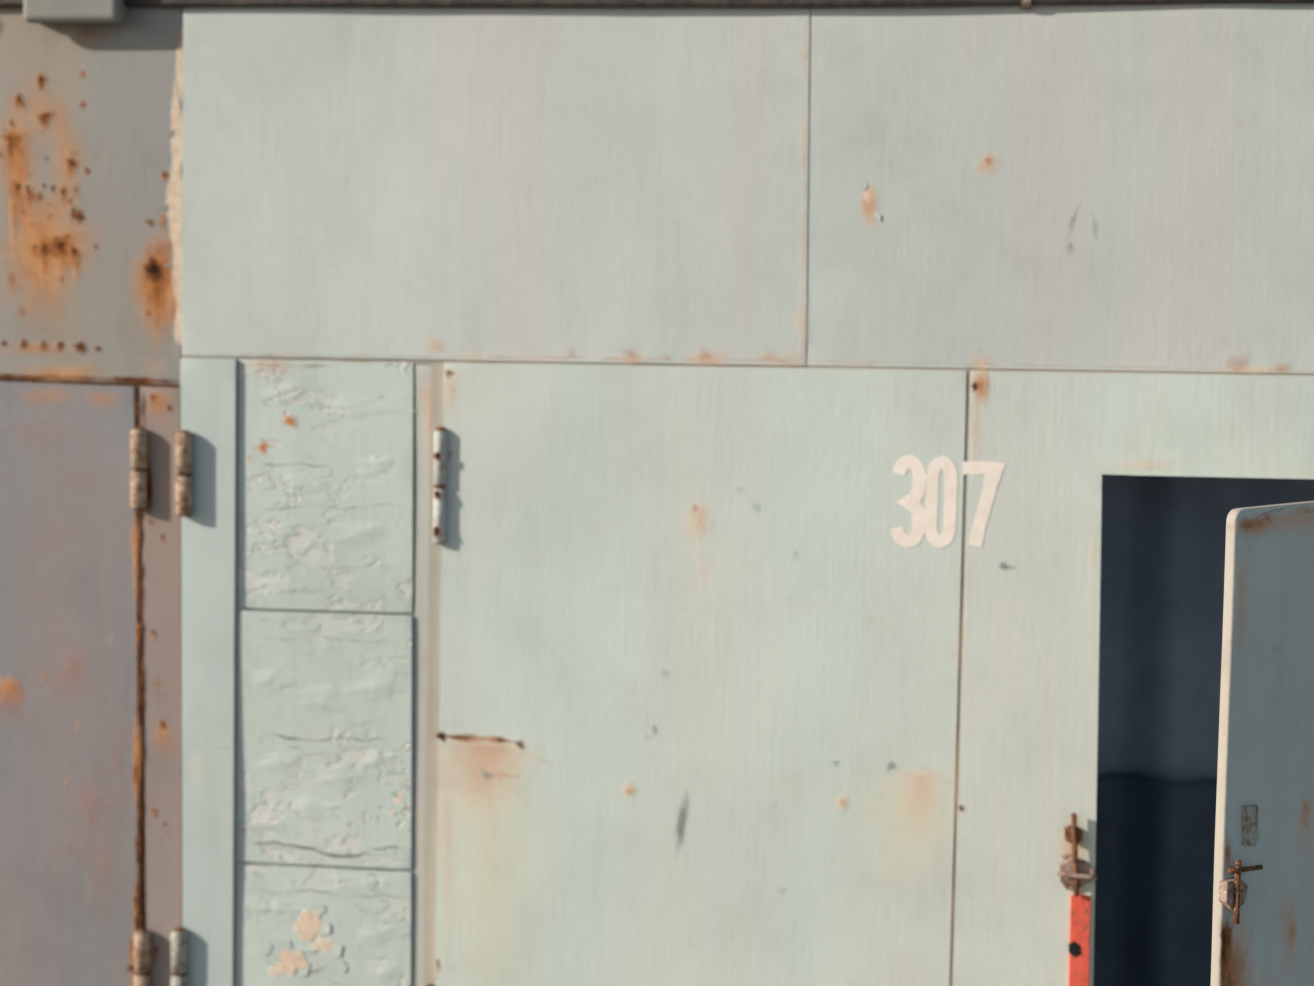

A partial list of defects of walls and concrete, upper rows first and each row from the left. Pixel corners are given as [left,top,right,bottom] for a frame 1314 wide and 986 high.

rust [3,95,88,285]
peeling [160,34,183,341]
rust [142,242,173,321]
rust [1,339,99,352]
rust [128,469,166,971]
rust [436,732,522,780]
peeling [259,904,347,976]
rust [1220,925,1242,986]